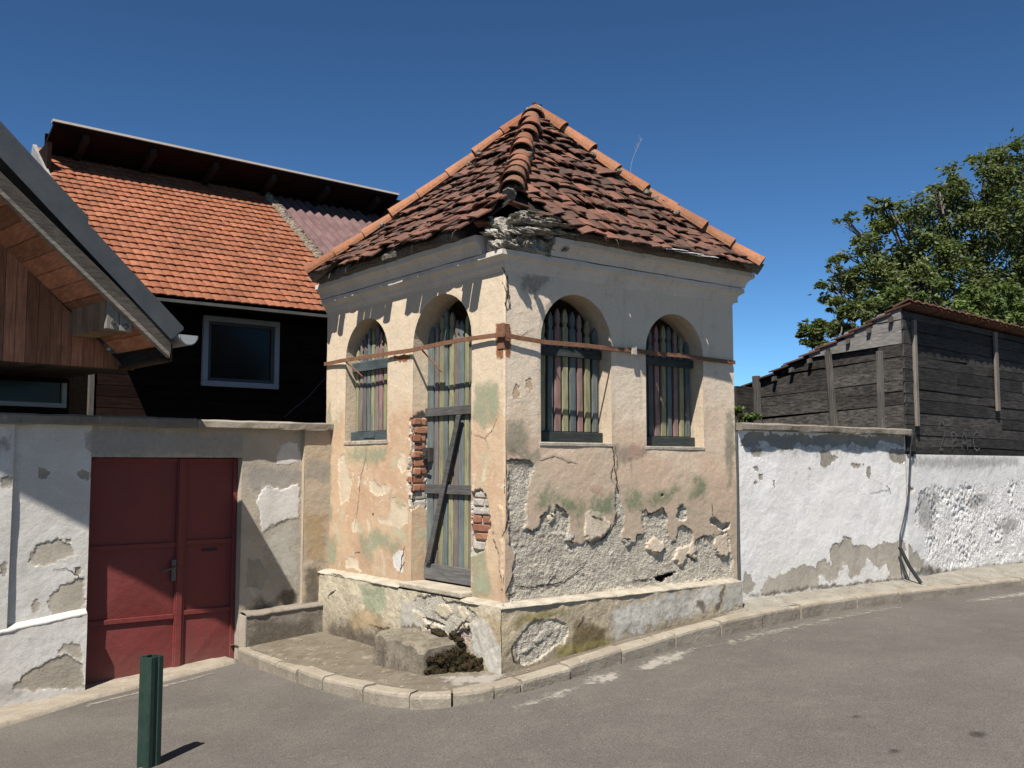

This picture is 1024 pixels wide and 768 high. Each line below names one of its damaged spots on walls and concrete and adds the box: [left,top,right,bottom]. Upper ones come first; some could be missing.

peeling [473,200,580,252]
corrosion [496,324,511,358]
flaking render [337,412,428,528]
crack [611,447,619,486]
flaking render [471,458,1024,602]
peeling [29,537,87,615]
peeling [12,643,85,693]
flaking render [413,594,476,652]
flaking render [514,618,569,666]